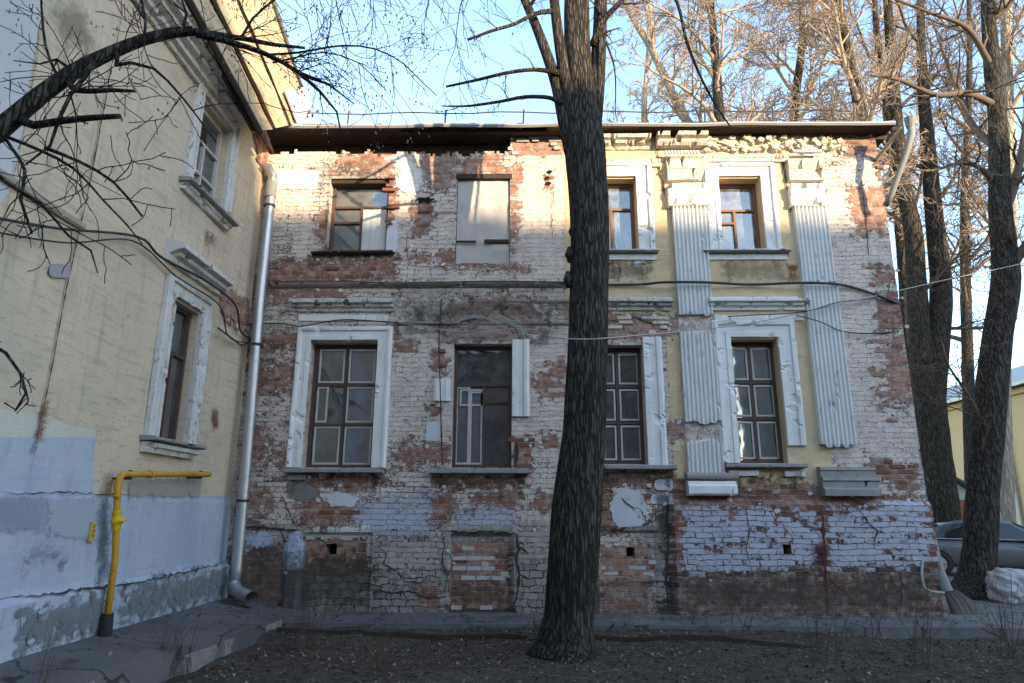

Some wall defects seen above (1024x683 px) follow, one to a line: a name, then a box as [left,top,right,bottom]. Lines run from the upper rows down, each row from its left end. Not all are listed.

crack [0,4,138,496]
flaking render [219,288,252,334]
flaking render [266,137,563,304]
flaking render [835,135,890,241]
flaking render [862,262,915,422]
peeling [13,583,107,657]
crack [0,562,225,636]
peeling [117,414,561,625]
crack [377,530,527,609]
flaking render [597,457,944,617]